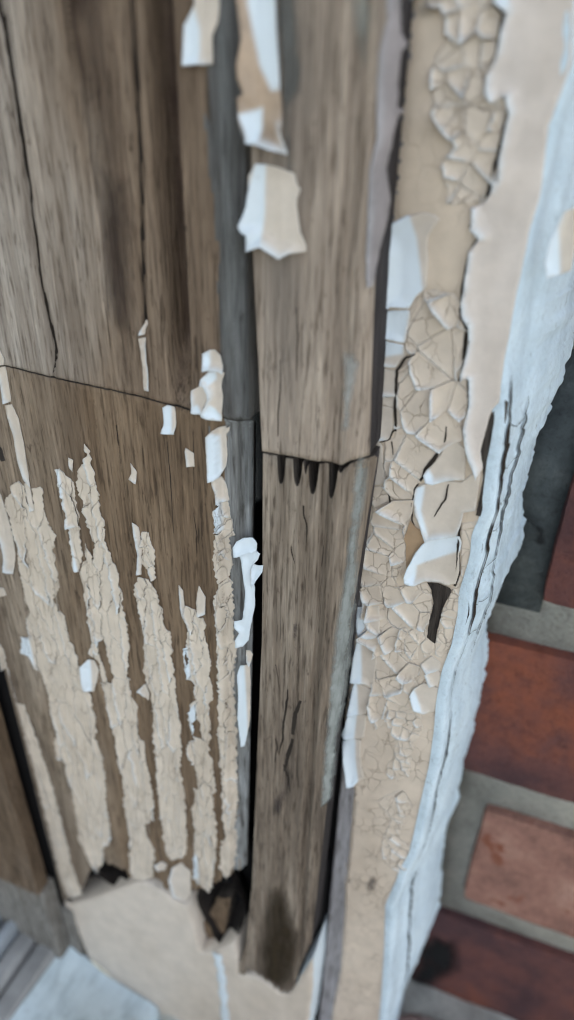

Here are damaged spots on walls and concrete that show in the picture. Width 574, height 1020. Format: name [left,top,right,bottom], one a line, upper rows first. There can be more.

peeling [182,0,220,66]
peeling [236,0,287,154]
crack [0,0,58,373]
peeling [237,164,307,260]
peeling [138,320,149,391]
peeling [341,0,574,874]
peeling [0,350,263,901]